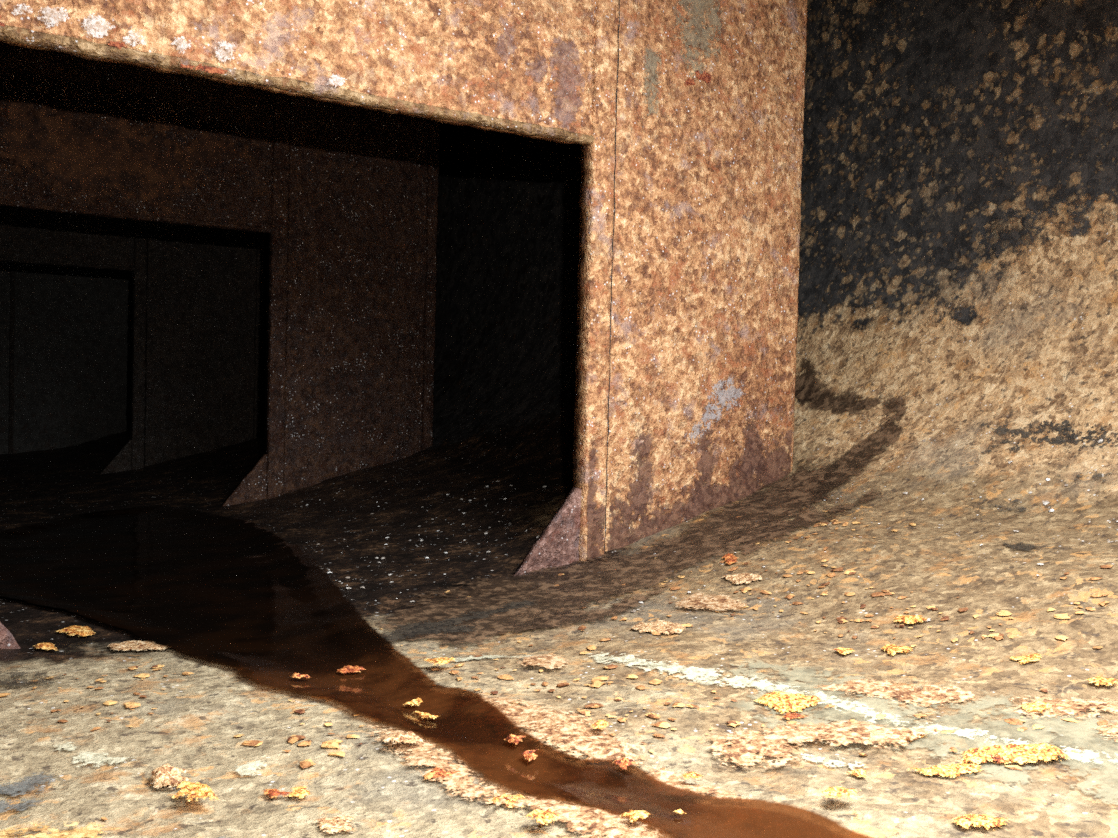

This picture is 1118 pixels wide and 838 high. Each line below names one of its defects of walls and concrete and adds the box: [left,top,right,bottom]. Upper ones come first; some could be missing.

leakage [372,358,907,662]
efflorescence [587,652,1118,804]